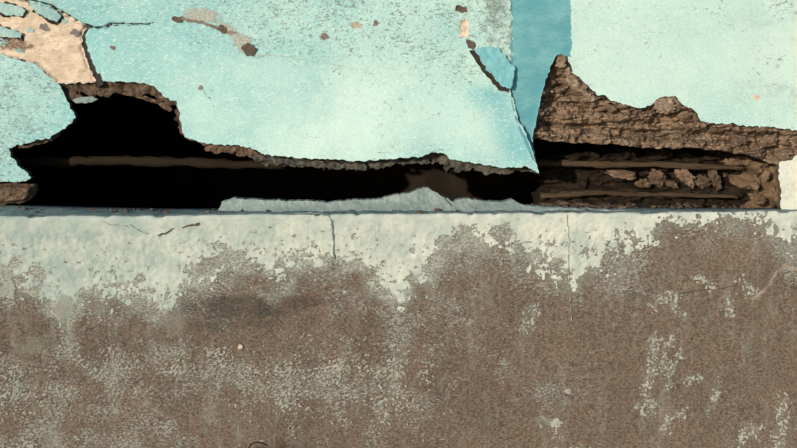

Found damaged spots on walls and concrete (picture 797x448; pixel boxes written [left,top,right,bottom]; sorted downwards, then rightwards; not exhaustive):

peeling [0,0,797,347]
peeling [0,317,439,448]
peeling [634,330,704,435]
peeling [731,391,797,448]